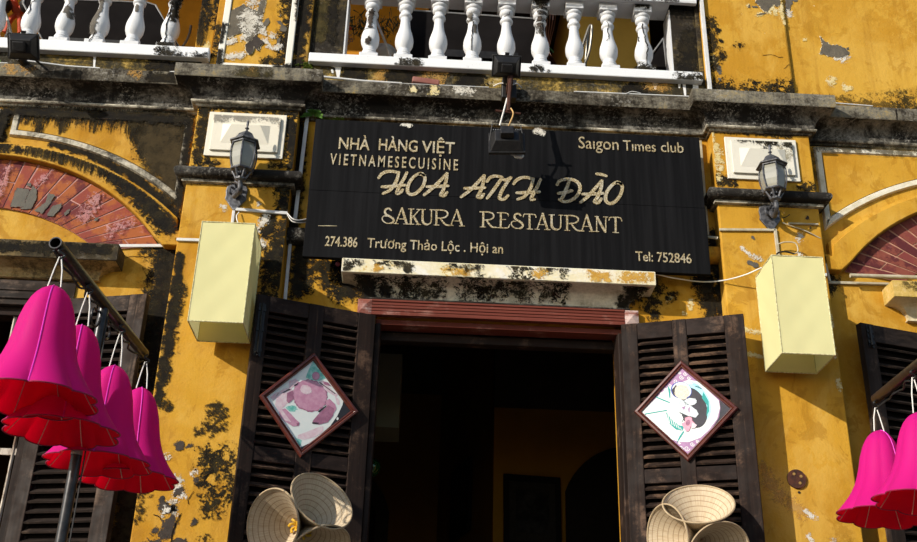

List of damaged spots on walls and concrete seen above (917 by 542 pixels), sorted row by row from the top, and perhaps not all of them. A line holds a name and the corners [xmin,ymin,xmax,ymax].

flaking render [224,0,287,60]
flaking render [746,0,798,25]
flaking render [819,36,851,64]
water stain [822,88,917,109]
flaking render [0,163,137,238]
water stain [0,104,572,412]
water stain [615,275,679,322]
water stain [689,264,723,317]
spalling [164,440,195,460]
water stain [192,400,238,520]
spalling [145,468,199,542]